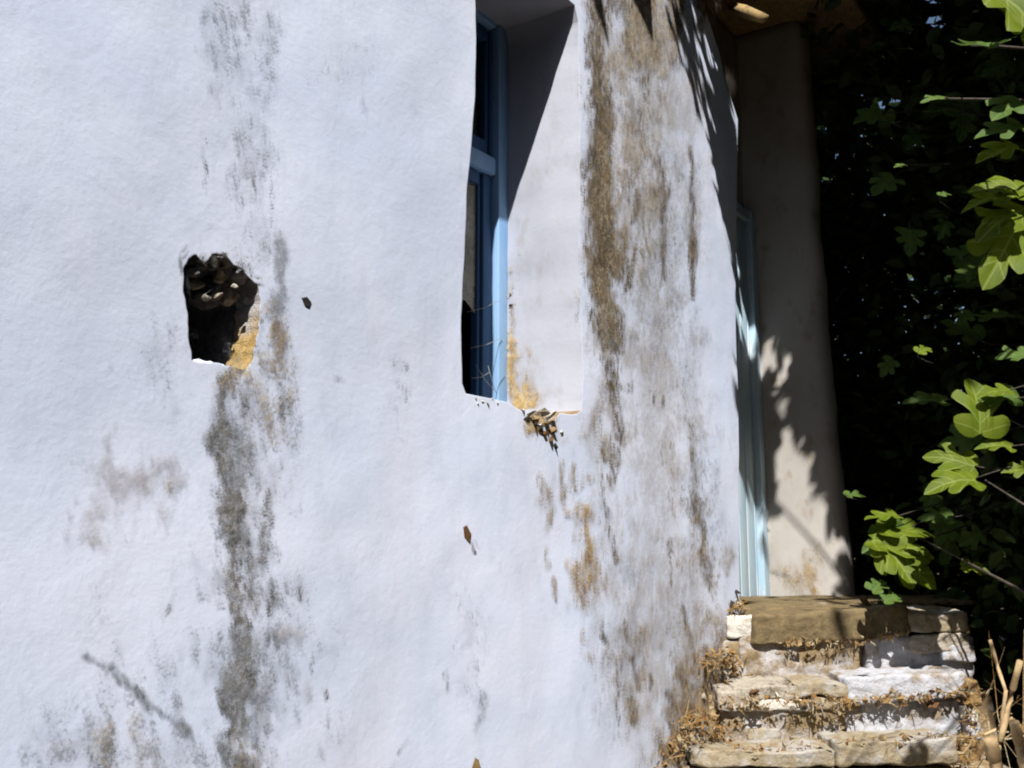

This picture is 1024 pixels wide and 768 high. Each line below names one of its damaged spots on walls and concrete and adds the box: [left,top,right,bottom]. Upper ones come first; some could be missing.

spalling [184,247,262,311]
flaking render [192,336,256,377]
peeling [507,284,555,433]
damp [536,0,708,593]
damp [174,231,306,768]
damp [639,378,735,768]
damp [80,697,158,768]
damp [588,619,654,733]